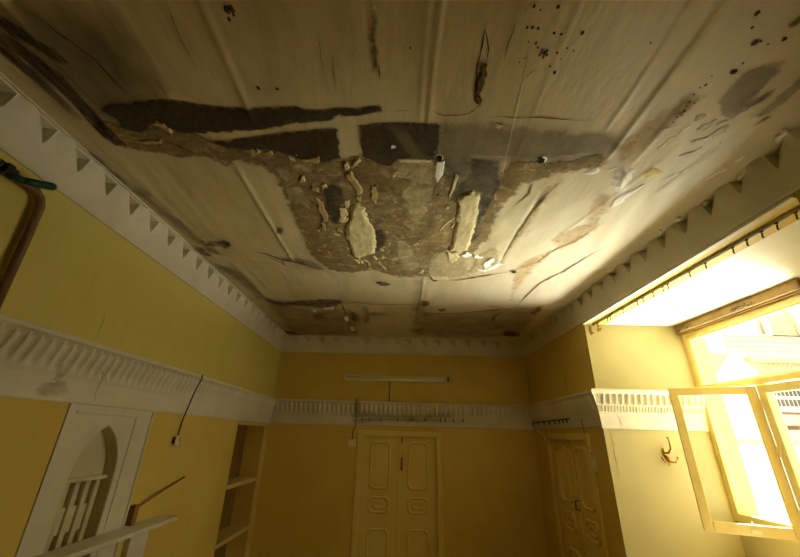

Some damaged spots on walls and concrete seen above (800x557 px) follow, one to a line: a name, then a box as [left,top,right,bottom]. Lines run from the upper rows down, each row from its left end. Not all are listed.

leakage [0,16,131,146]
crack [432,23,516,116]
leakage [725,62,800,124]
flaking render [657,113,730,157]
spalling [103,121,618,286]
flaking render [610,167,689,208]
crack [453,182,603,309]
leakage [266,299,341,308]
crack [324,302,504,334]